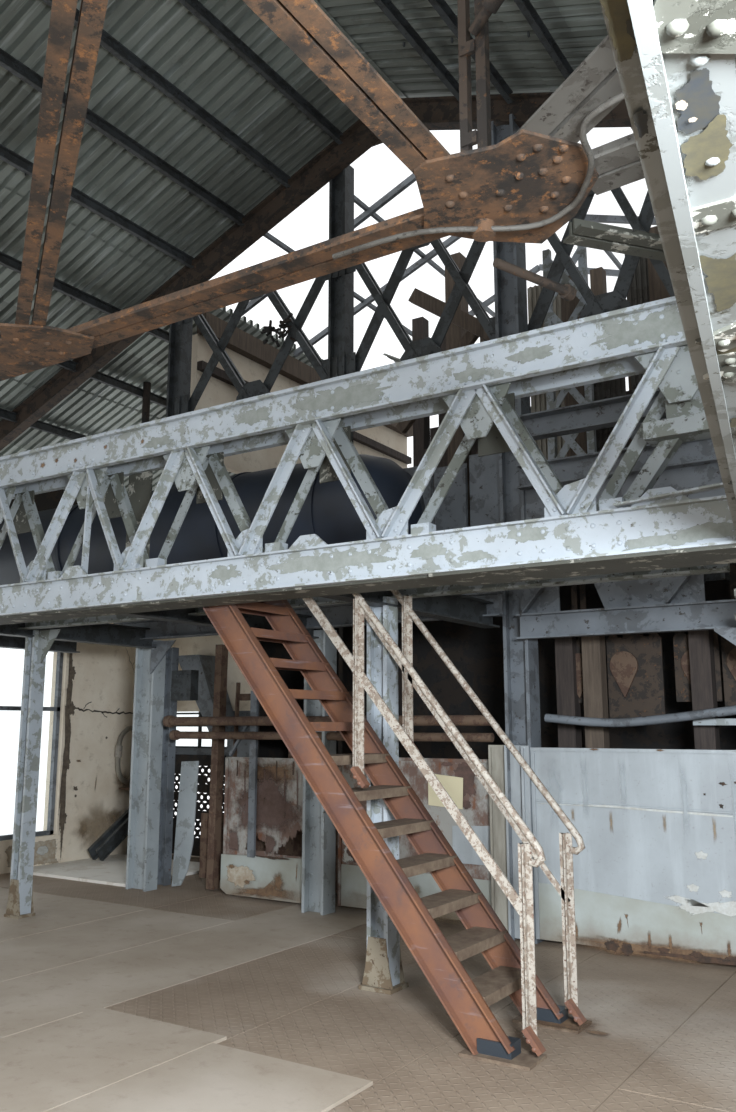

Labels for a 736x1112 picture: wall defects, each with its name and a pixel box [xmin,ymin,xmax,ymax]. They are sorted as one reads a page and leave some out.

peeling [600,0,636,62]
peeling [675,68,734,180]
peeling [699,253,736,312]
peeling [592,306,684,350]
peeling [505,343,554,364]
peeling [293,383,396,413]
peeling [266,548,396,574]
peeling [410,543,491,562]
peeling [507,526,549,543]
peeling [623,521,736,551]
peeling [666,884,736,917]
rust [576,914,736,965]